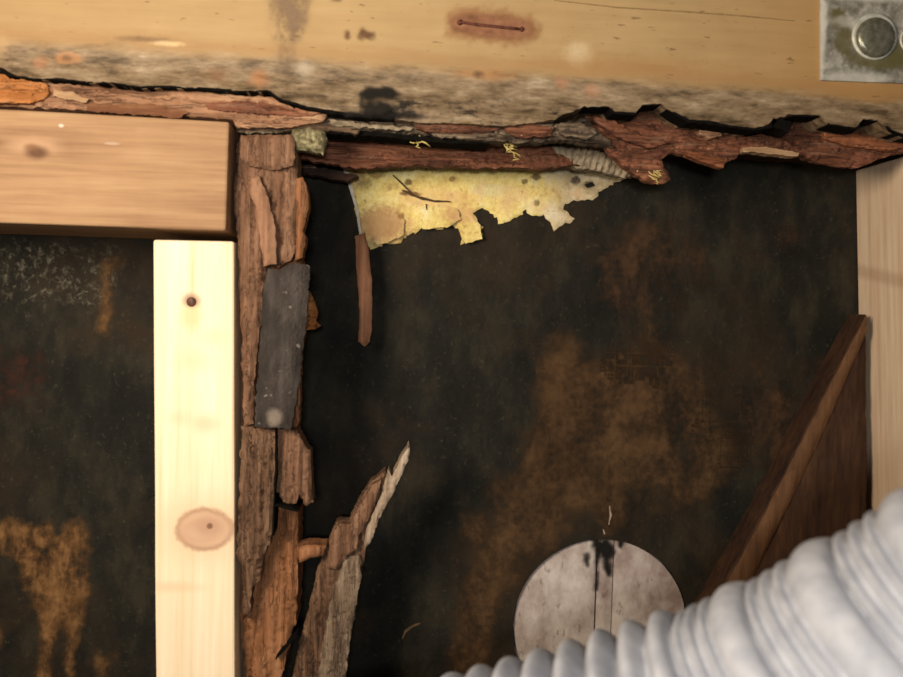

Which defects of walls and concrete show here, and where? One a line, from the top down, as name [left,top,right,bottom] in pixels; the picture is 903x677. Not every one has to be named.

rust [450,11,535,40]
spalling [344,86,416,119]
peeling [343,167,632,250]
crack [272,428,303,537]
peeling [295,478,381,569]
damp [452,324,731,673]
crack [275,621,302,659]